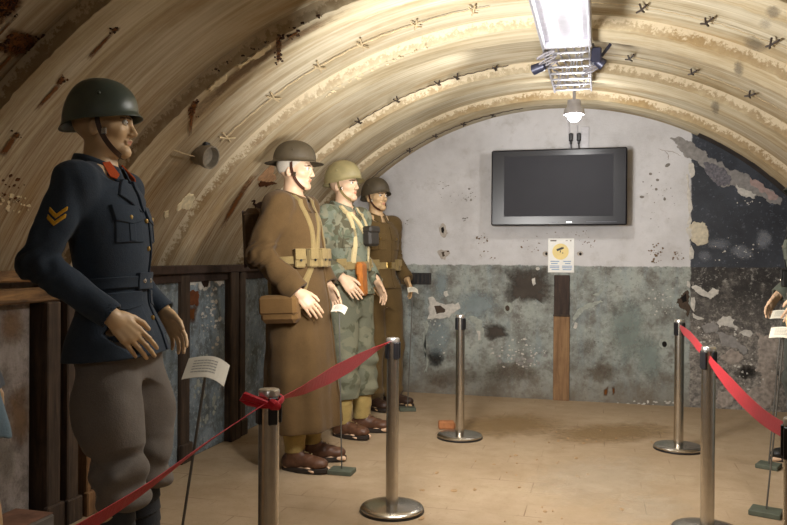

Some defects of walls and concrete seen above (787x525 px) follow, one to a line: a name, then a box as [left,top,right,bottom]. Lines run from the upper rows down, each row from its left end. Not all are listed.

peeling [670,136,782,225]
peeling [504,267,553,314]
spalling [423,291,461,373]
peeling [469,316,548,369]